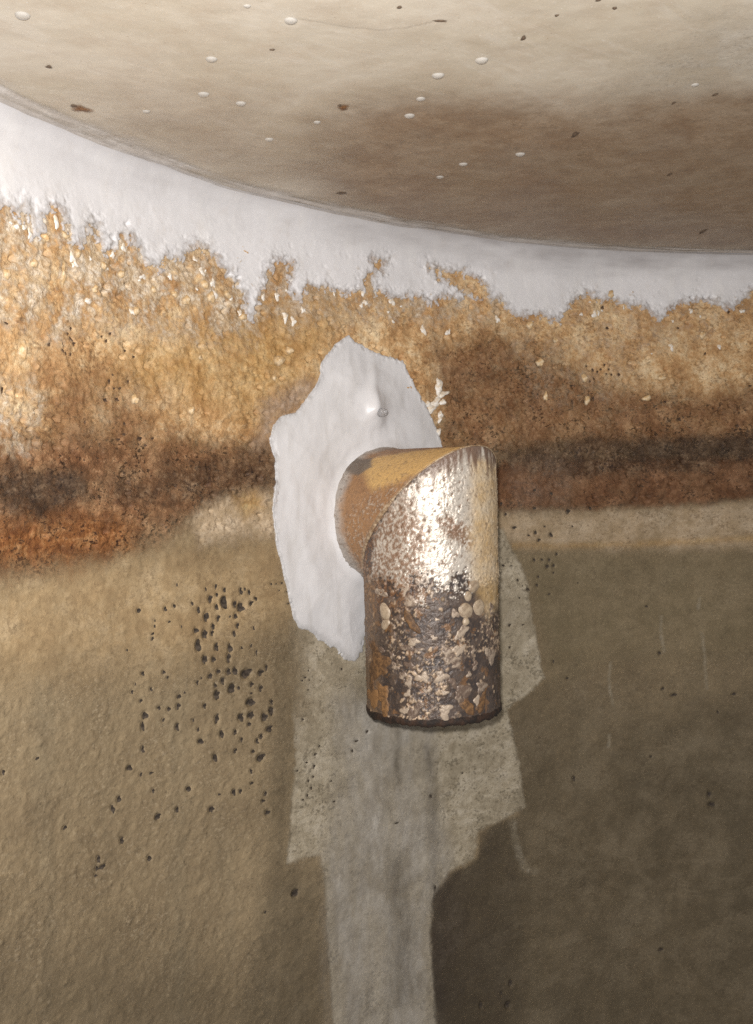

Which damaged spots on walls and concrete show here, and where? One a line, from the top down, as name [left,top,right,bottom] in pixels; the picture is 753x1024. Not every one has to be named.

leakage [328,93,753,247]
leakage [0,206,478,342]
corrosion [0,202,753,566]
leakage [0,465,87,516]
leakage [115,453,275,501]
leakage [512,434,753,475]
leakage [287,506,753,1024]